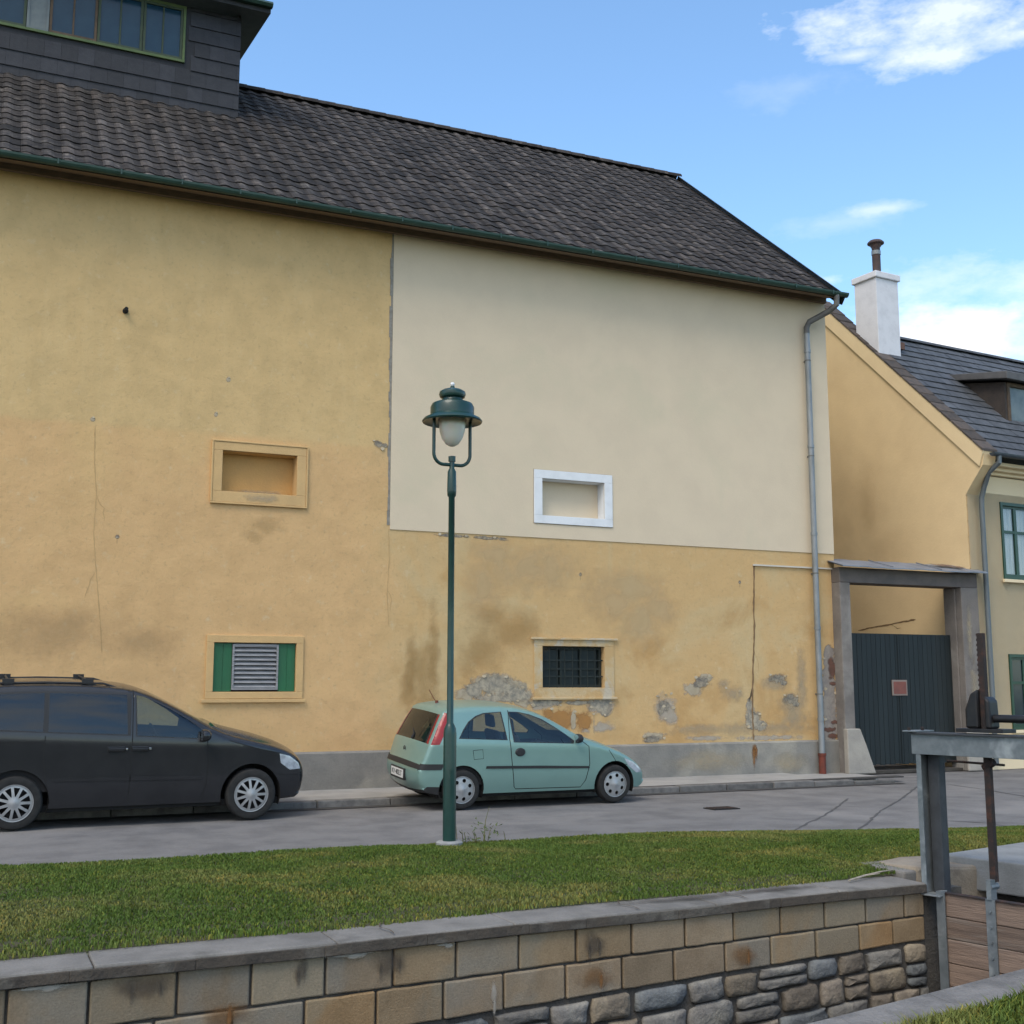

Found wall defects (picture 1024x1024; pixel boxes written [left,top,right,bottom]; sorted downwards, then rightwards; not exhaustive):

crack [85,430,105,652]
crack [748,566,759,740]
flaking render [456,673,612,732]
flaking render [656,674,713,723]
flaking render [725,687,767,731]
flaking render [769,674,799,706]
flaking render [822,644,838,740]